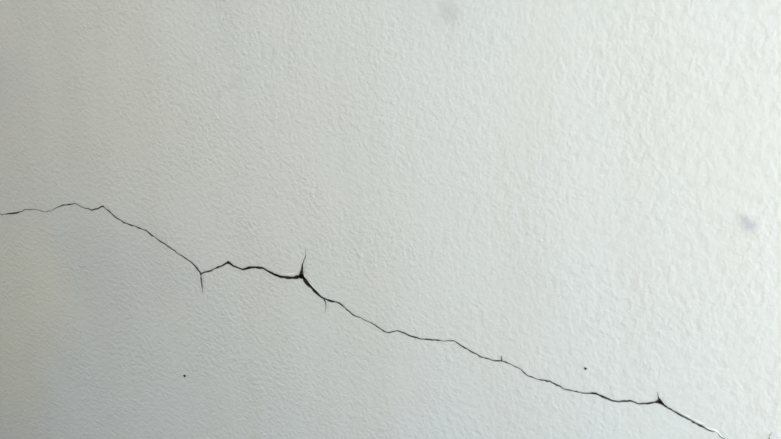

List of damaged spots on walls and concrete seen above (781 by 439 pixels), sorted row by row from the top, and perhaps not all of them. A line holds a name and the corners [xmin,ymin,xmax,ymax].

crack [2,203,725,439]